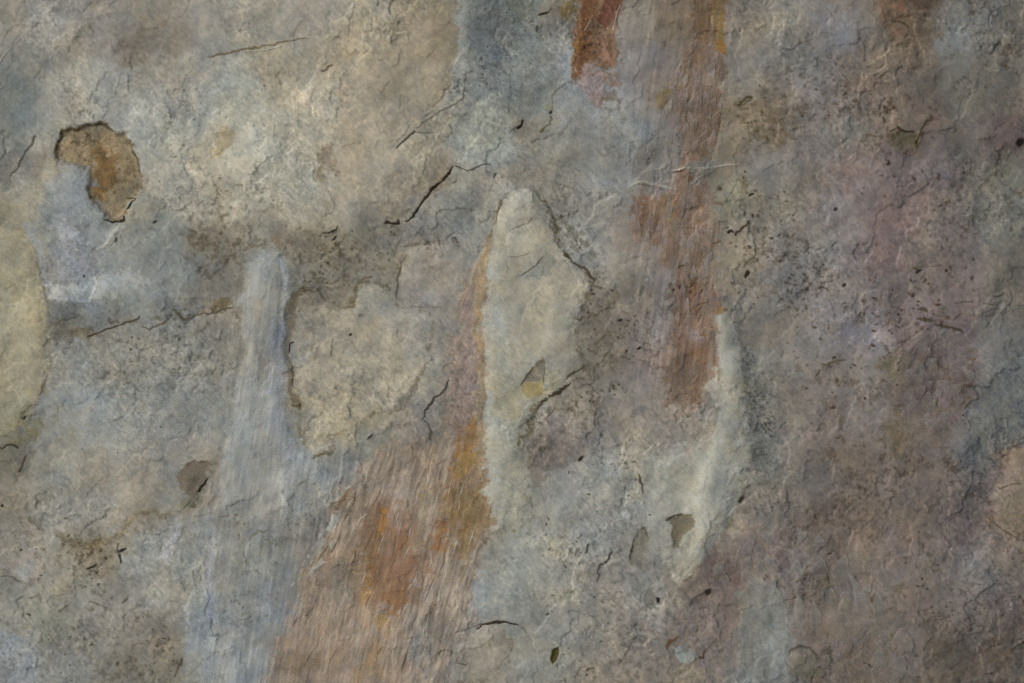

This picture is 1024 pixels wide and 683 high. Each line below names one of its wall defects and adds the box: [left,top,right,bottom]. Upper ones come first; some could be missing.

rust [560,0,622,108]
flaking render [54,121,143,223]
crack [384,164,496,225]
rust [630,0,728,418]
crack [58,303,232,337]
flaking render [521,360,545,398]
crack [422,380,449,440]
flaking render [177,456,211,495]
rust [264,233,495,683]
flaking render [629,527,649,571]
flaking render [666,514,694,548]
crack [477,620,518,629]